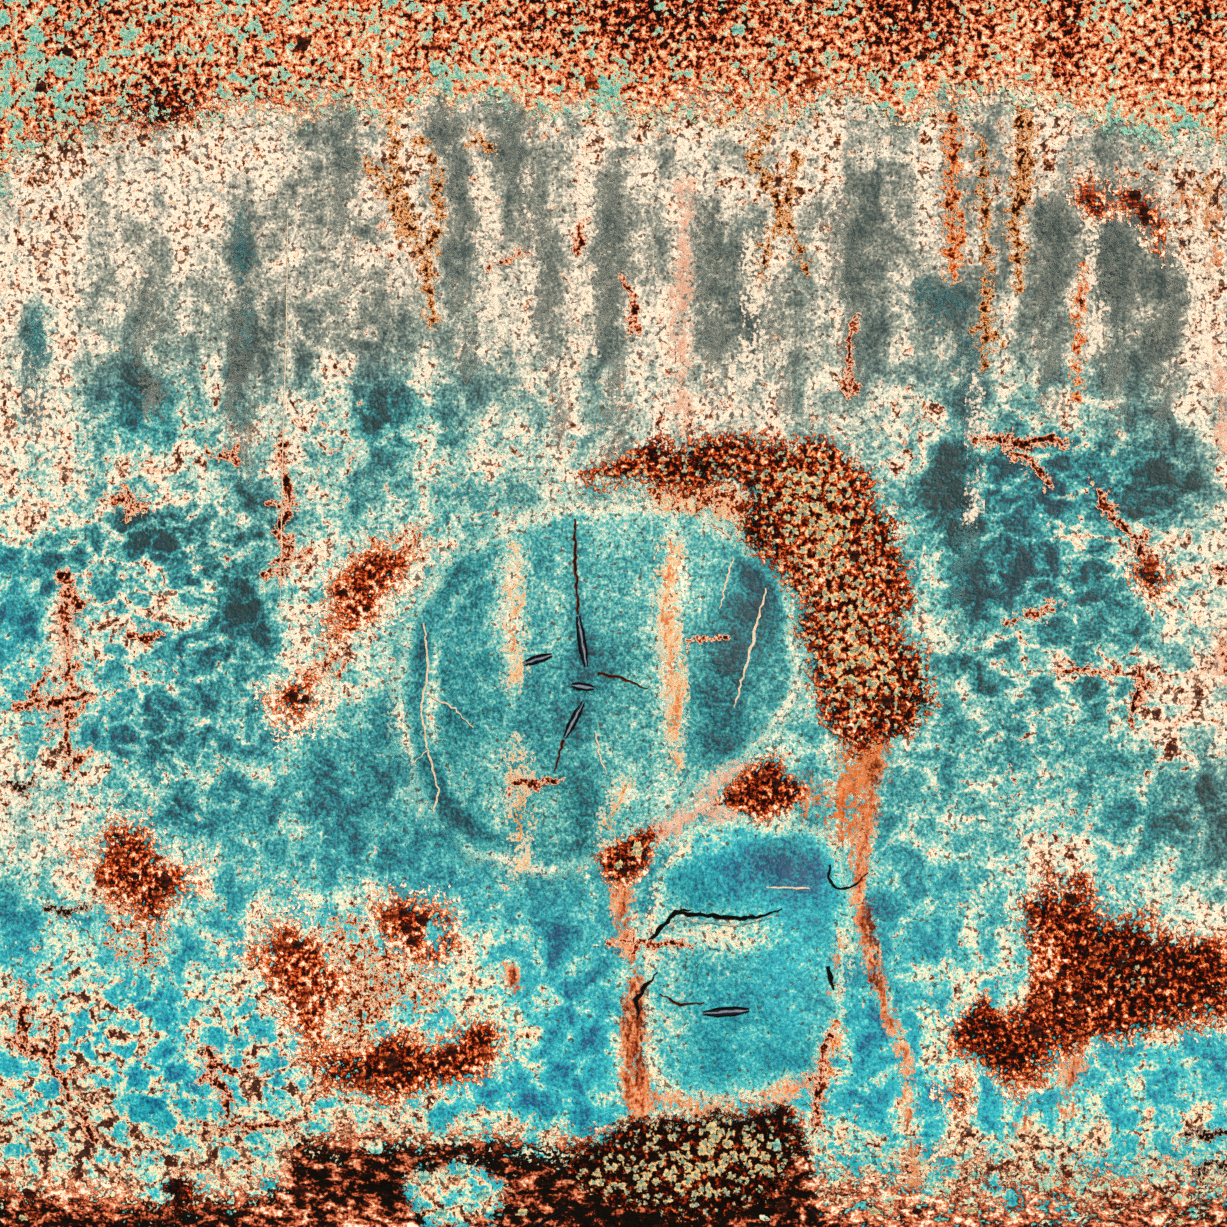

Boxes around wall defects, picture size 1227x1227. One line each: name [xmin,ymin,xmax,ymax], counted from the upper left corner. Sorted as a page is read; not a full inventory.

damp [428,97,639,483]
corrosion [0,0,1227,376]
damp [690,190,799,418]
damp [1025,187,1221,449]
crack [503,518,648,797]
damp [651,532,691,776]
corrosion [571,173,943,1135]
damp [500,731,538,884]
corrosion [230,876,526,1118]
corrosion [0,965,1227,1227]
crack [604,908,782,1020]
corrosion [928,848,1227,1132]